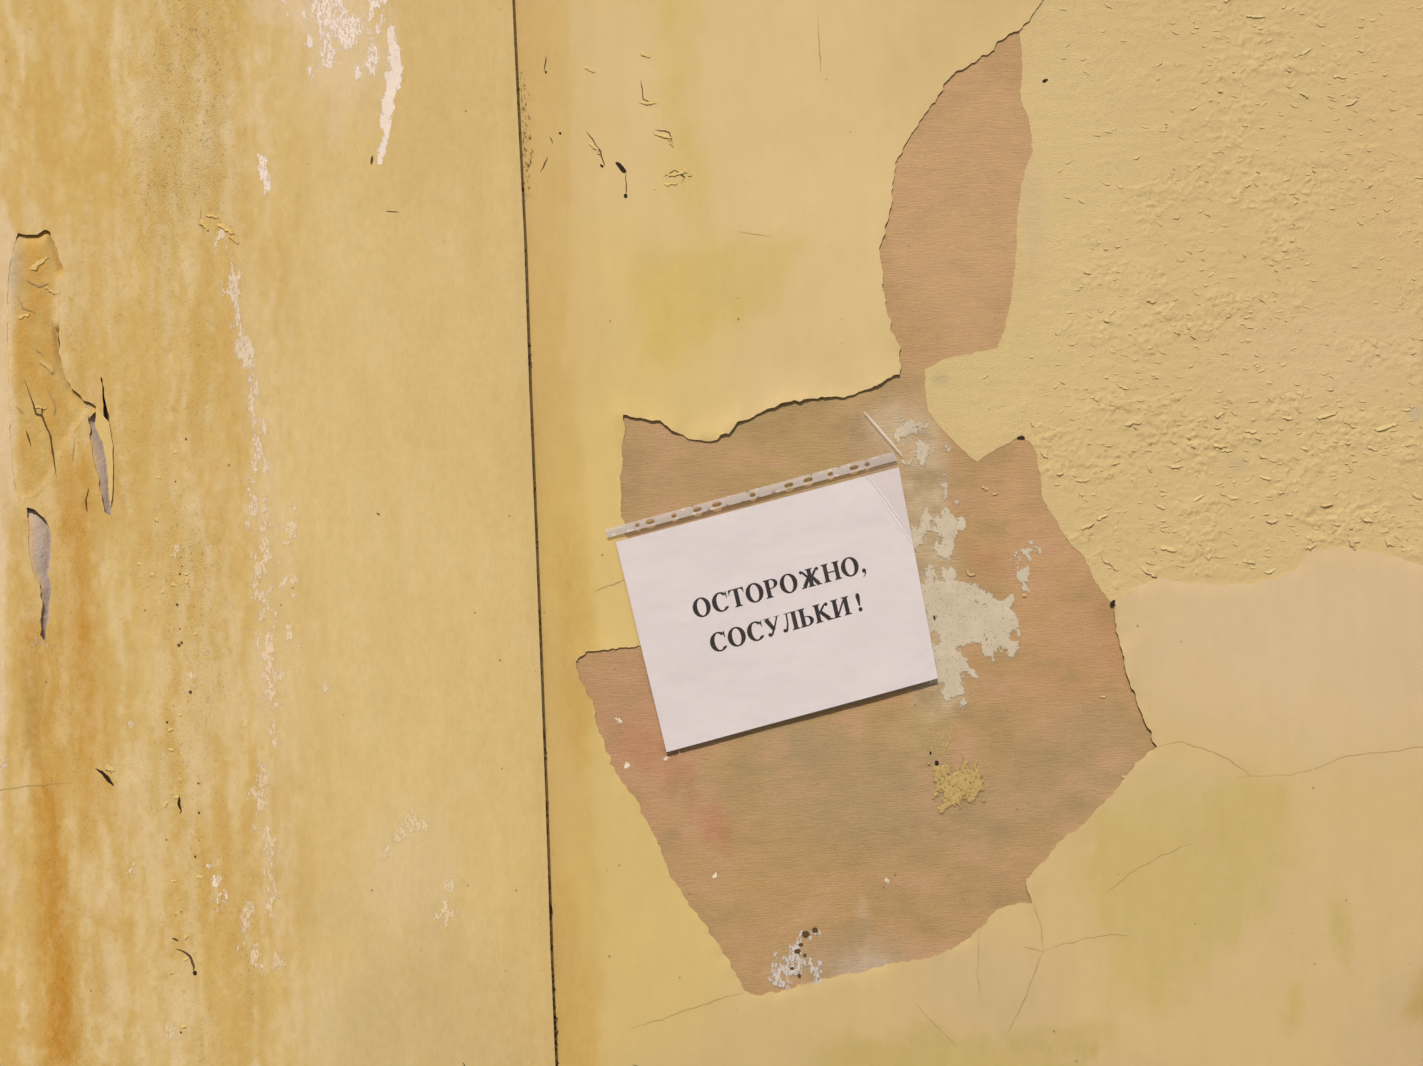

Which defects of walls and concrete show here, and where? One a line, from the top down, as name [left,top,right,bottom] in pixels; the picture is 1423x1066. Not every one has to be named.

damp [282,0,404,165]
damp [257,154,272,197]
peeling [7,230,113,641]
peeling [576,0,1423,996]
efflorescence [205,223,304,977]
crack [1157,741,1423,777]
crack [1006,905,1126,1035]